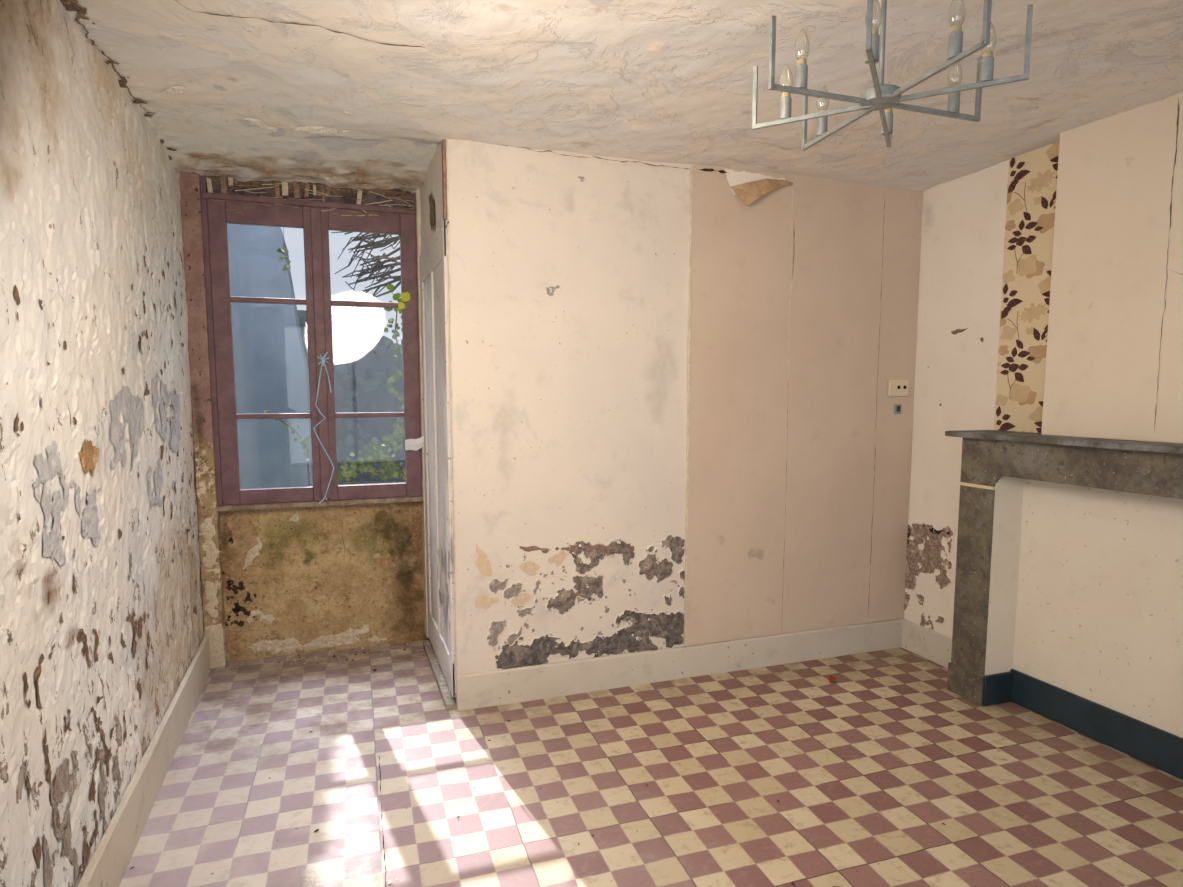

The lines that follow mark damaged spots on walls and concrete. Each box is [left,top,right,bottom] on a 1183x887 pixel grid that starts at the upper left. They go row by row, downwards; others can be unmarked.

flaking render [60,0,95,24]
crack [175,0,427,49]
crack [72,3,148,117]
flaking render [106,60,129,88]
water stain [191,154,381,187]
flaking render [206,176,434,231]
peeling [20,222,275,668]
flaking render [473,533,685,670]
flaking render [904,522,955,631]
peeling [250,624,387,655]